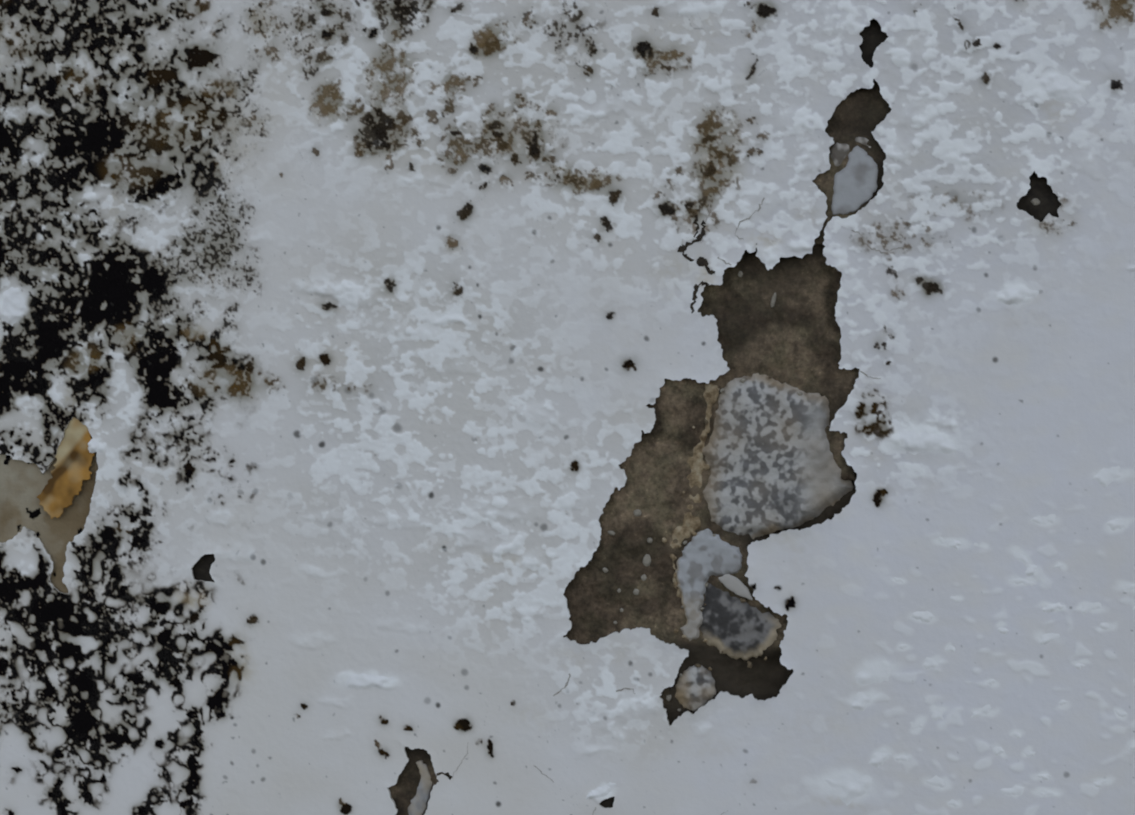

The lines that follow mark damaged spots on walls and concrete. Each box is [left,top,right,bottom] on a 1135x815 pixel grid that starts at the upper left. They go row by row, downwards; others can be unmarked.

mould [243,0,433,80]
mould [523,3,597,76]
damp [744,2,776,18]
mould [347,82,421,170]
mould [426,76,622,204]
mould [655,111,767,231]
peeling [1017,171,1062,222]
mould [0,0,279,815]
peeling [563,19,891,725]
peeling [0,417,98,593]
hole [192,554,215,582]
peeling [389,747,439,815]